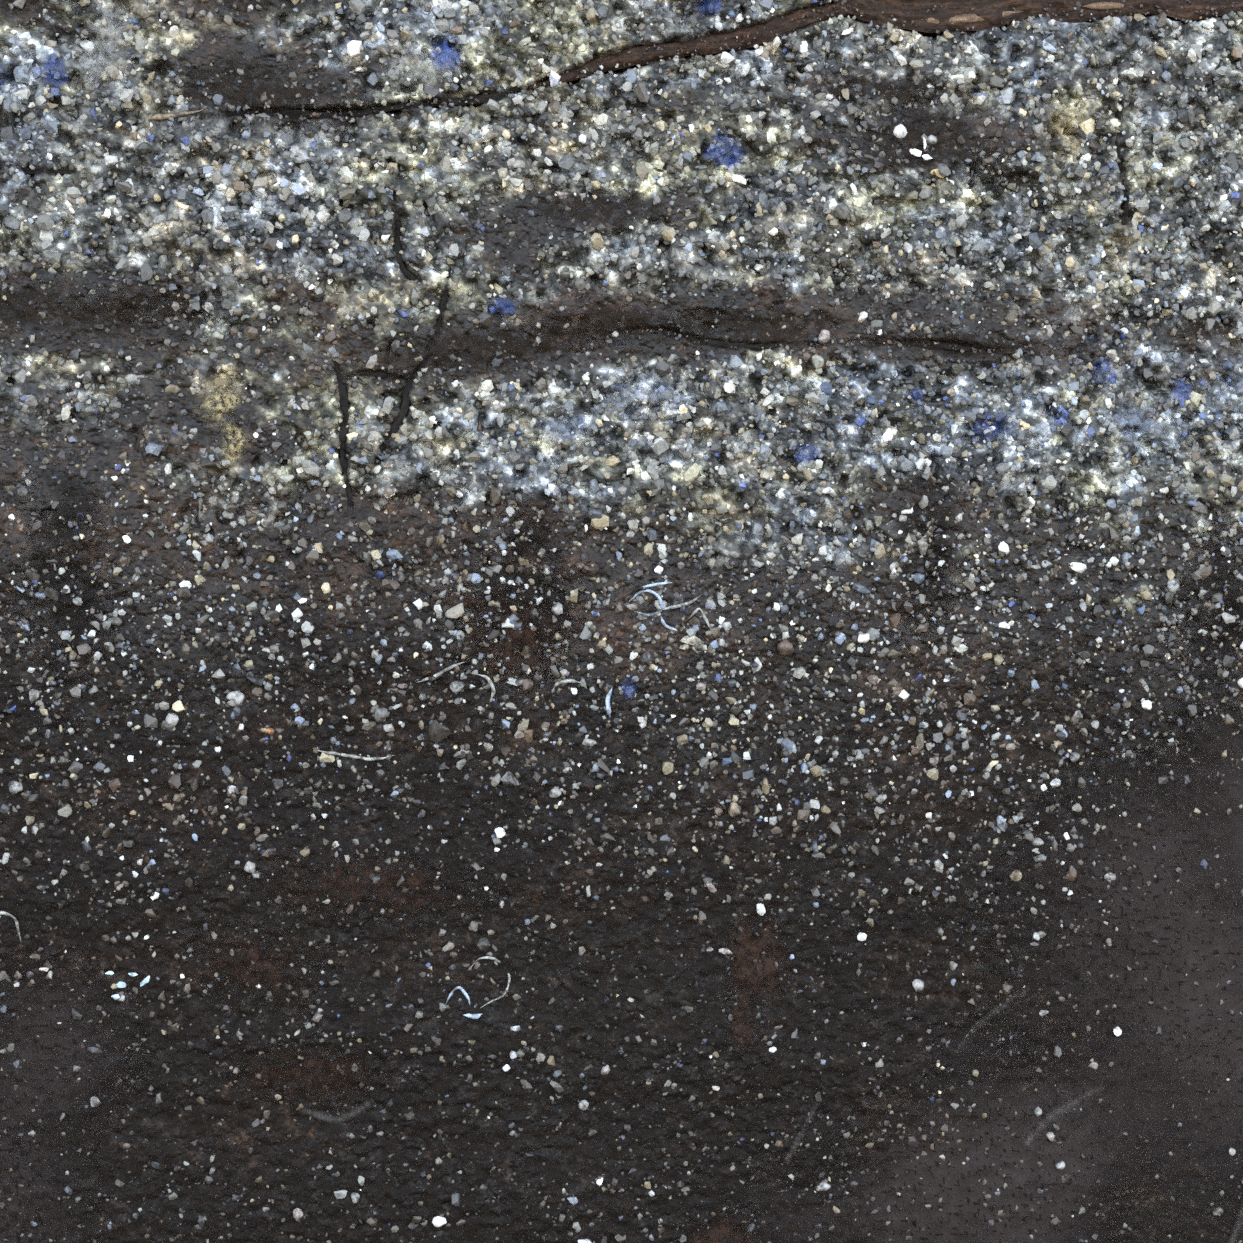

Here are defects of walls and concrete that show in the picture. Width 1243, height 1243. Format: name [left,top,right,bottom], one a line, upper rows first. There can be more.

crack [204,0,1243,118]
crack [1116,76,1129,225]
crack [605,329,780,350]